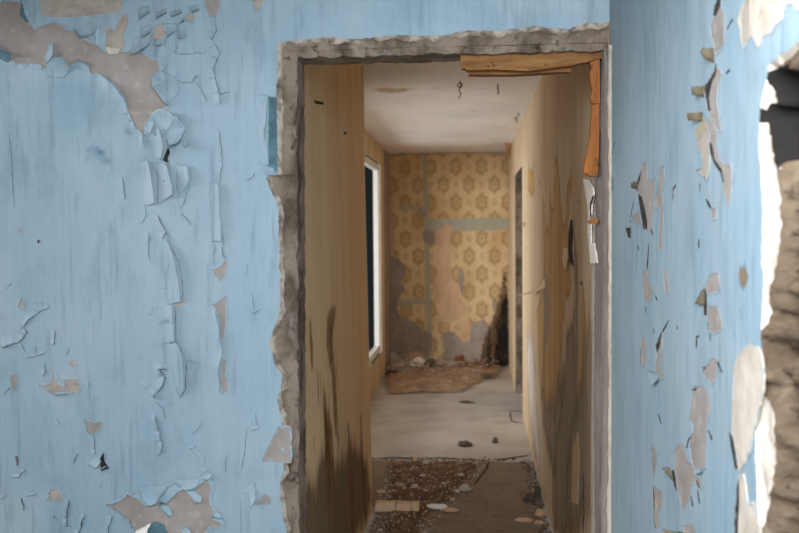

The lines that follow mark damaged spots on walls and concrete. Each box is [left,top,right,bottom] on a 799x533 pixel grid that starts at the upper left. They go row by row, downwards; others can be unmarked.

peeling [0,0,223,165]
peeling [687,0,799,221]
peeling [106,471,226,533]
peeling [179,294,231,397]
leakage [306,309,373,533]
spalling [243,22,615,533]
leakage [481,272,509,367]
peeling [625,161,676,313]
peeling [640,320,669,385]
peeling [652,356,722,533]
peeling [694,271,723,341]
spalling [729,41,799,533]